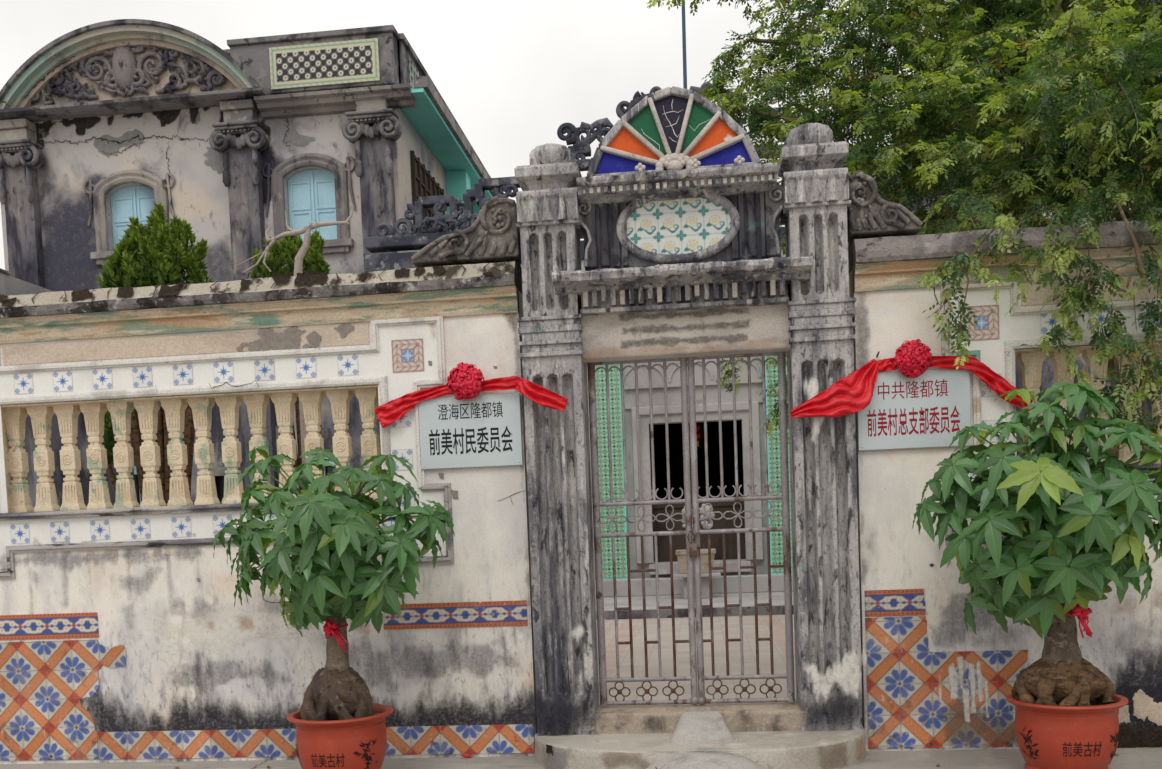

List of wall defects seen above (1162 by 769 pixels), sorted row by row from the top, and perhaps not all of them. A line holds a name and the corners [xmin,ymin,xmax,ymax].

spalling [94,129,144,155]
crack [39,134,209,177]
damp [41,176,107,292]
damp [201,246,231,282]
spalling [236,326,322,352]
spalling [334,323,355,338]
damp [1116,650,1162,690]
damp [80,695,298,732]
damp [385,689,598,738]
damp [807,691,863,731]
spalling [1116,685,1162,727]